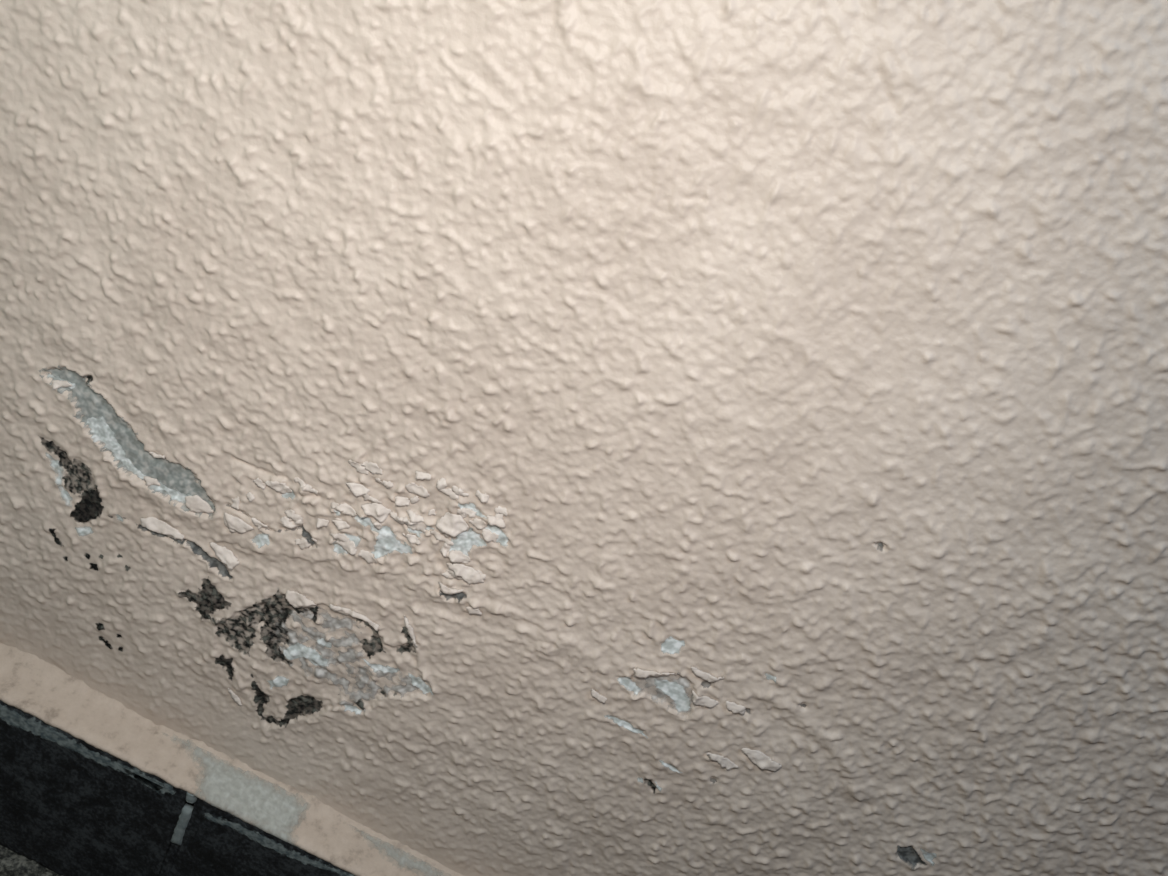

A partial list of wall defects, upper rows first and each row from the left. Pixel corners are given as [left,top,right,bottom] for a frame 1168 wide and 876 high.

peeling [41,366,509,615]
flaking render [178,579,434,728]
peeling [661,636,685,654]
peeling [591,689,646,736]
peeling [618,667,750,715]
peeling [707,747,782,783]